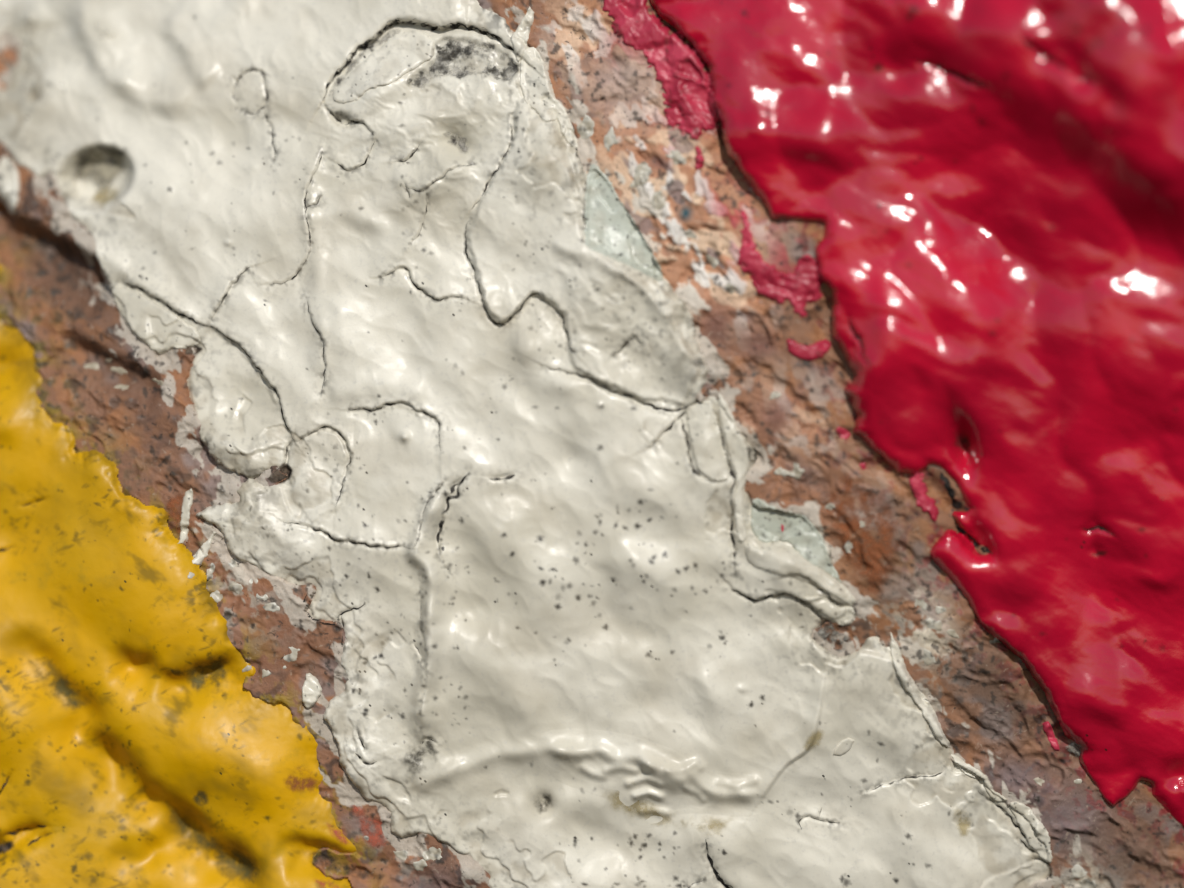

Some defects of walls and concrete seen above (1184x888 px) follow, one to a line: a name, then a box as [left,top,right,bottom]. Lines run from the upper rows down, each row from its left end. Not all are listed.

peeling [324,6,618,152]
crack [304,109,374,243]
peeling [112,287,202,354]
crack [124,267,292,456]
crack [387,130,849,627]
peeling [179,488,280,612]
crack [284,474,514,549]
peeling [686,394,856,651]
rust [828,481,893,591]
rust [288,778,315,789]
peeling [890,632,1052,863]
crack [689,842,733,888]